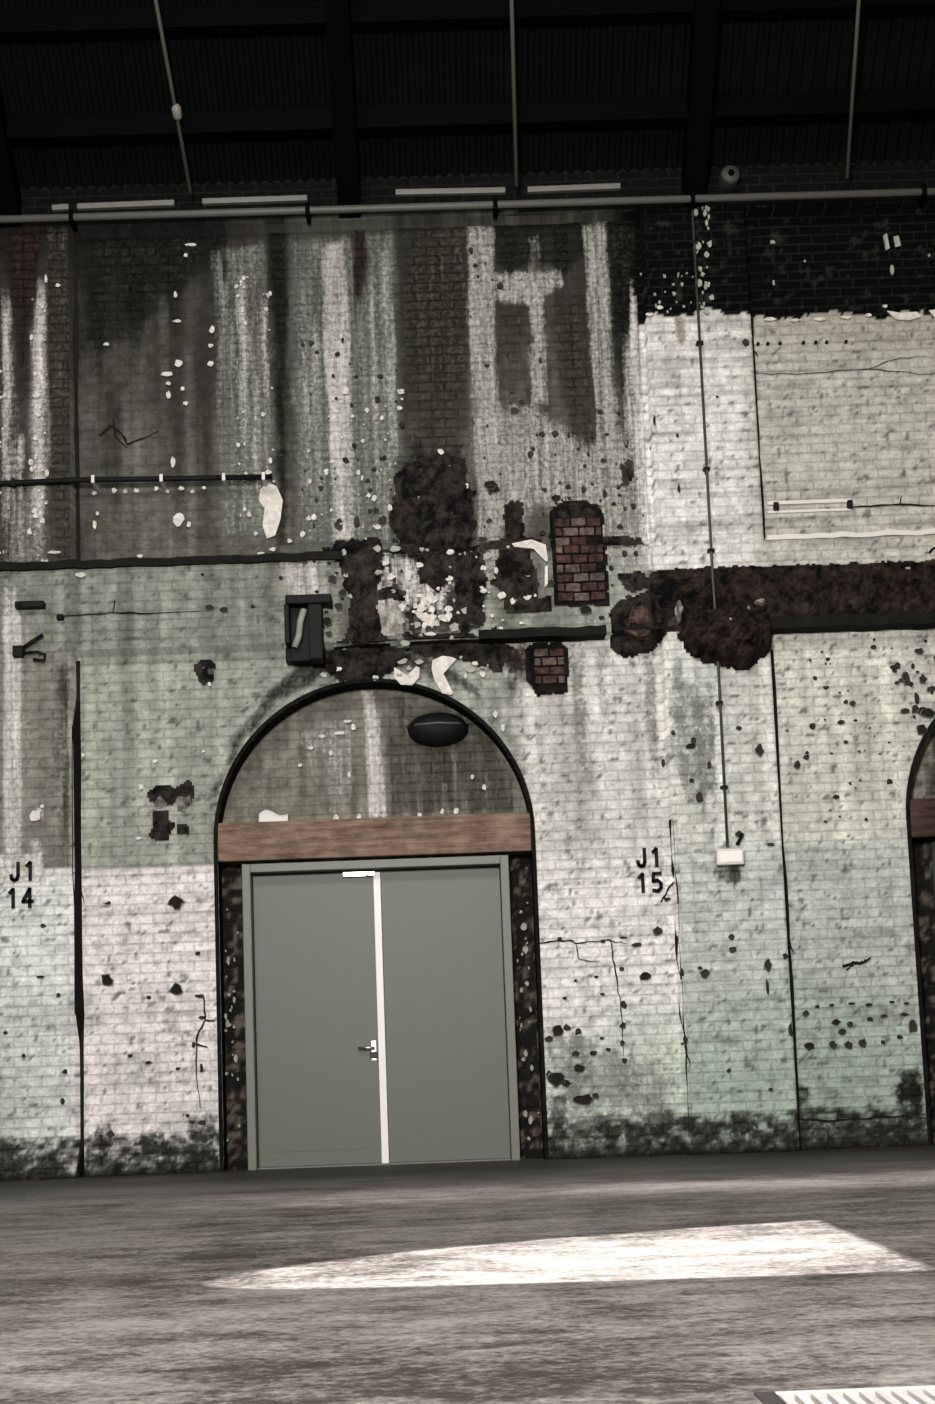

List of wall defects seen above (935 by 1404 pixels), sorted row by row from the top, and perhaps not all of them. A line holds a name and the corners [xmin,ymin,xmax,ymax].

peeling [645,205,714,316]
peeling [883,233,901,276]
peeling [764,305,935,322]
water stain [3,215,653,610]
spalling [236,338,935,697]
peeling [809,651,904,755]
peeling [870,636,935,735]
flaking render [135,780,194,840]
peeling [788,1001,917,1051]
water stain [0,1143,71,1181]
water stain [87,1116,219,1174]
water stain [548,1037,929,1158]